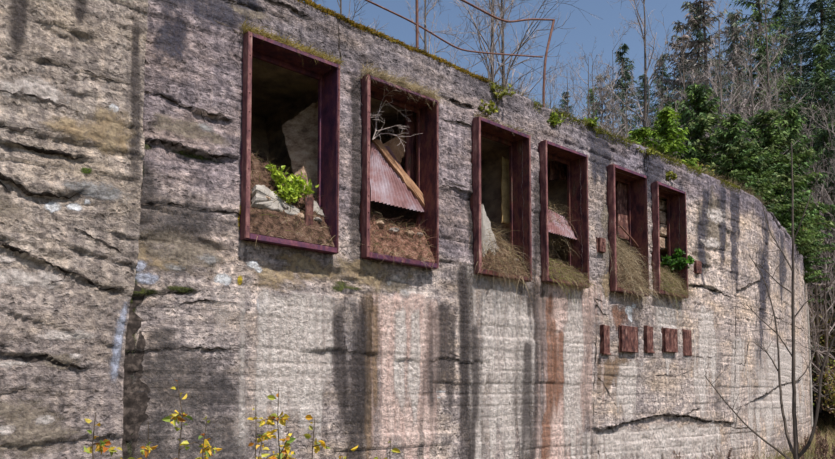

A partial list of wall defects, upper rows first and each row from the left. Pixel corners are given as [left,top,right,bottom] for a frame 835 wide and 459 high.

leakage [11,0,26,48]
leakage [75,0,87,22]
crack [0,172,82,199]
crack [141,182,240,216]
leakage [129,76,807,459]
leakage [111,306,129,378]
crack [0,228,245,459]
rust [541,295,564,459]
crack [591,219,802,459]